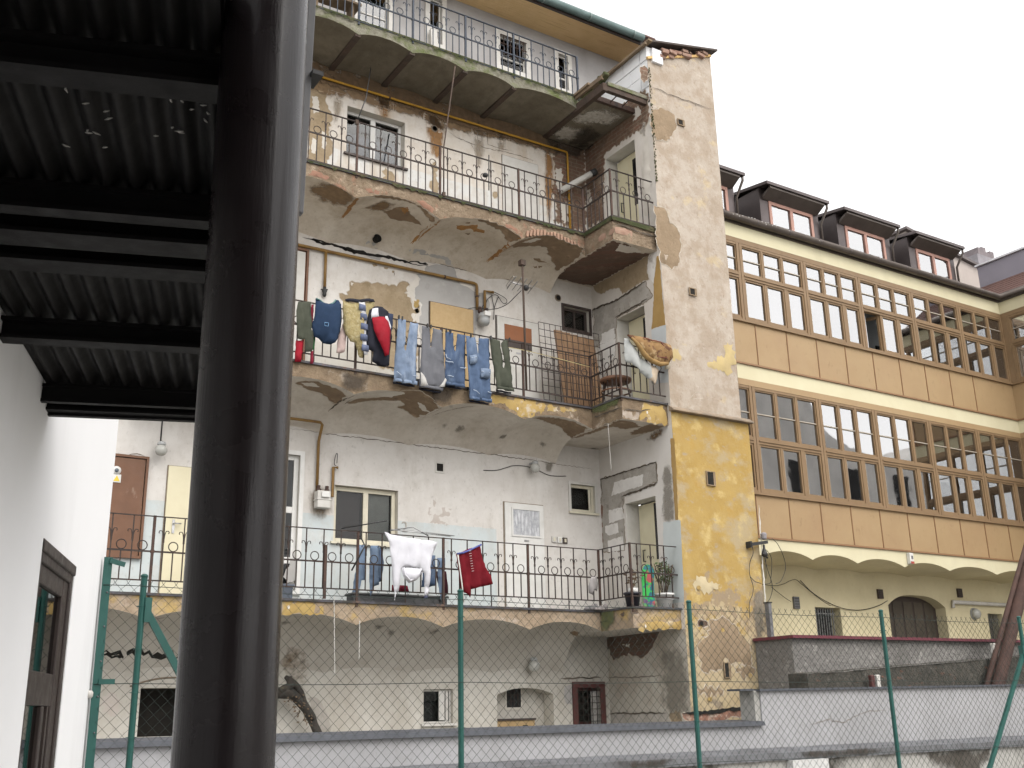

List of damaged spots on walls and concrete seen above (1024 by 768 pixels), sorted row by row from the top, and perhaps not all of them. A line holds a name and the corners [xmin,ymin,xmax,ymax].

flaking render [307,88,333,180]
spalling [365,162,441,225]
crack [303,221,521,280]
flaking render [456,65,685,377]
flaking render [339,264,421,372]
spalling [295,380,442,420]
spalling [491,395,668,439]
spalling [706,471,716,486]
flaking render [693,575,719,595]
flaking render [607,609,682,661]